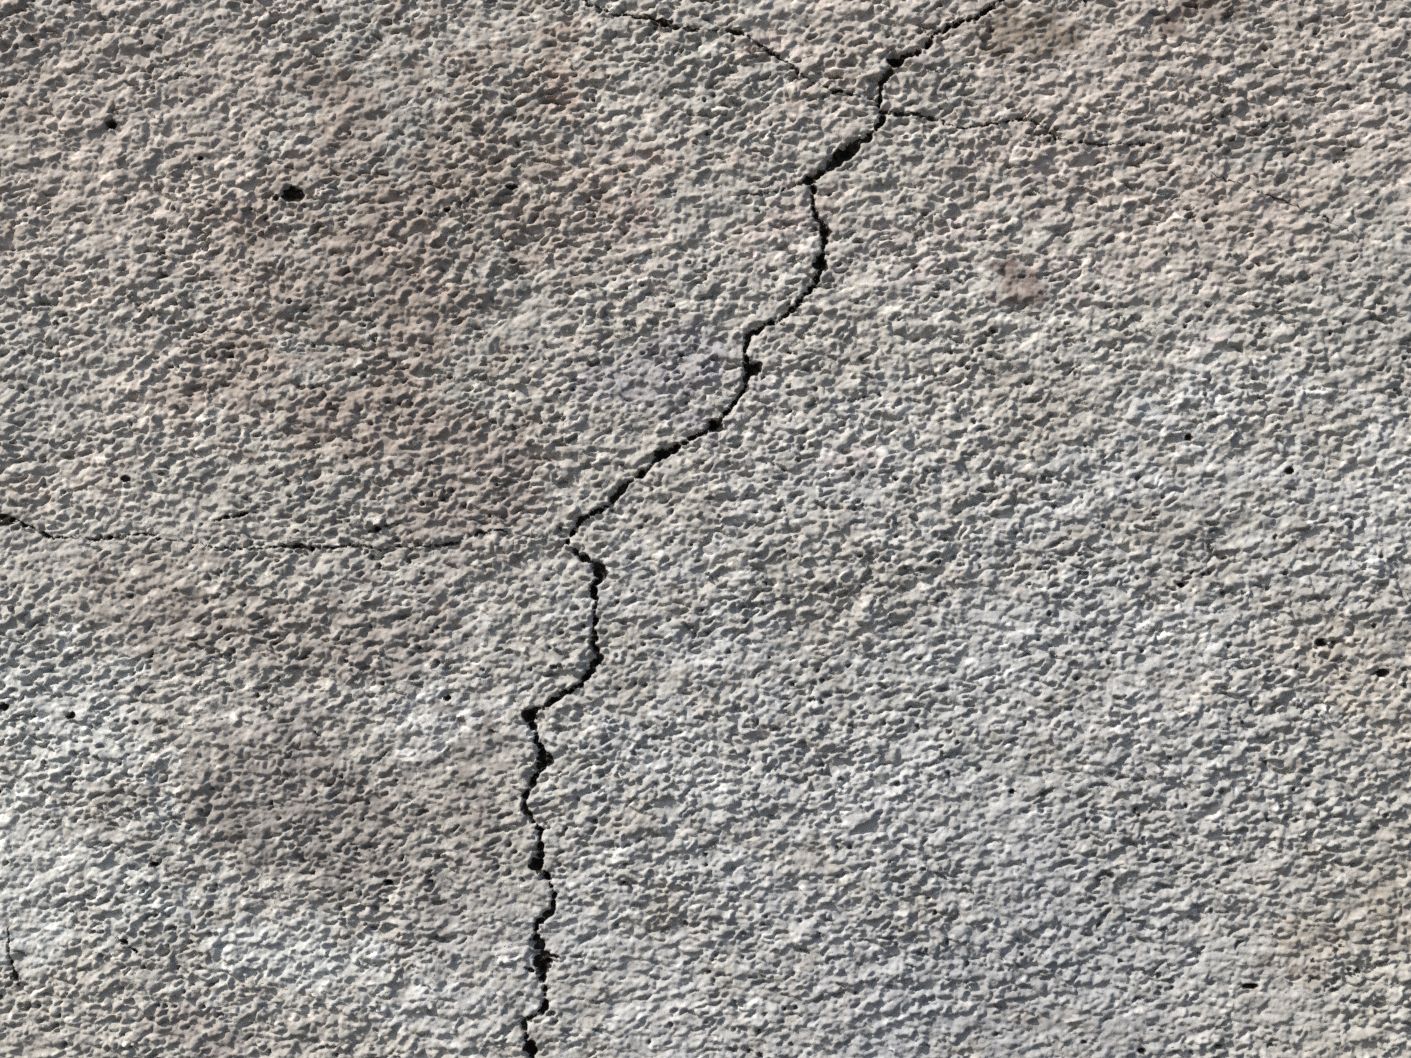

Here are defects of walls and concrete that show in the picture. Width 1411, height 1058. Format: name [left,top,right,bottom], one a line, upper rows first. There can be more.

crack [0,513,81,540]
crack [87,0,1152,1058]
crack [7,928,20,986]